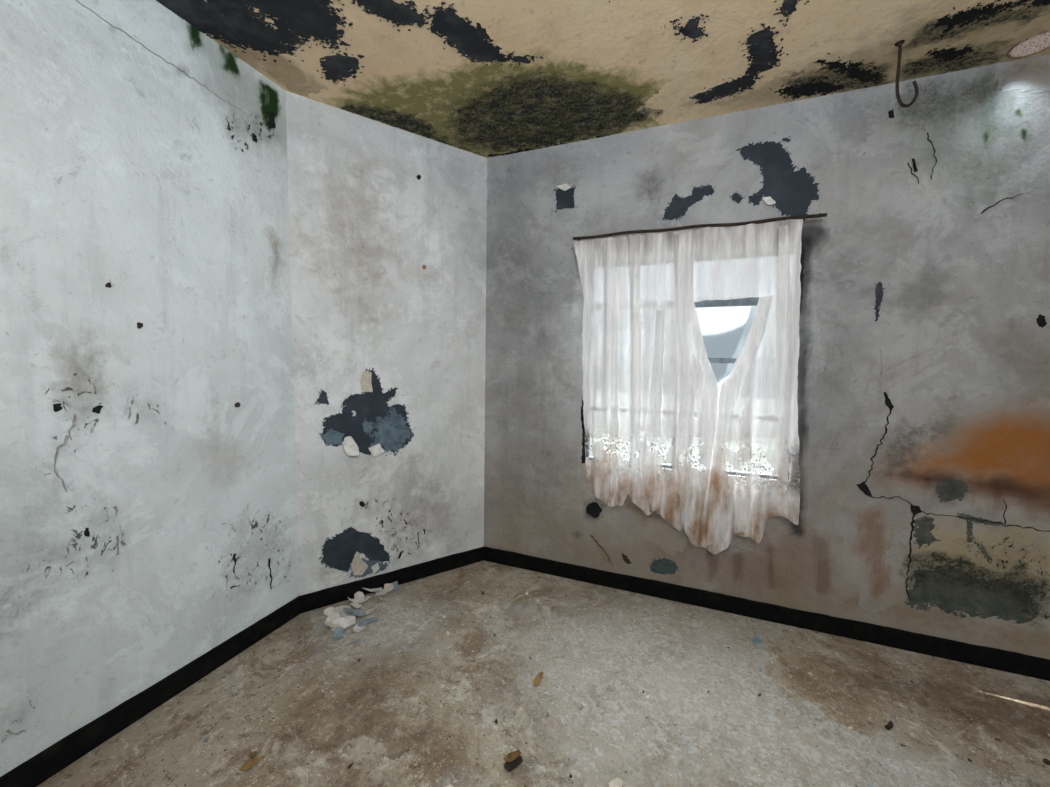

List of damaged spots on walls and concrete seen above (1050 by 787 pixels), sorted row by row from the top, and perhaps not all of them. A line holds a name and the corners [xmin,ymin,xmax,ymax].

peeling [156,0,543,86]
peeling [664,14,709,42]
peeling [689,0,809,104]
peeling [662,185,715,220]
peeling [729,136,822,221]
damp [907,132,937,184]
peeling [314,368,414,457]
rust [840,372,1050,615]
crack [856,350,1050,599]
peeling [319,498,425,586]
damp [818,501,1050,659]